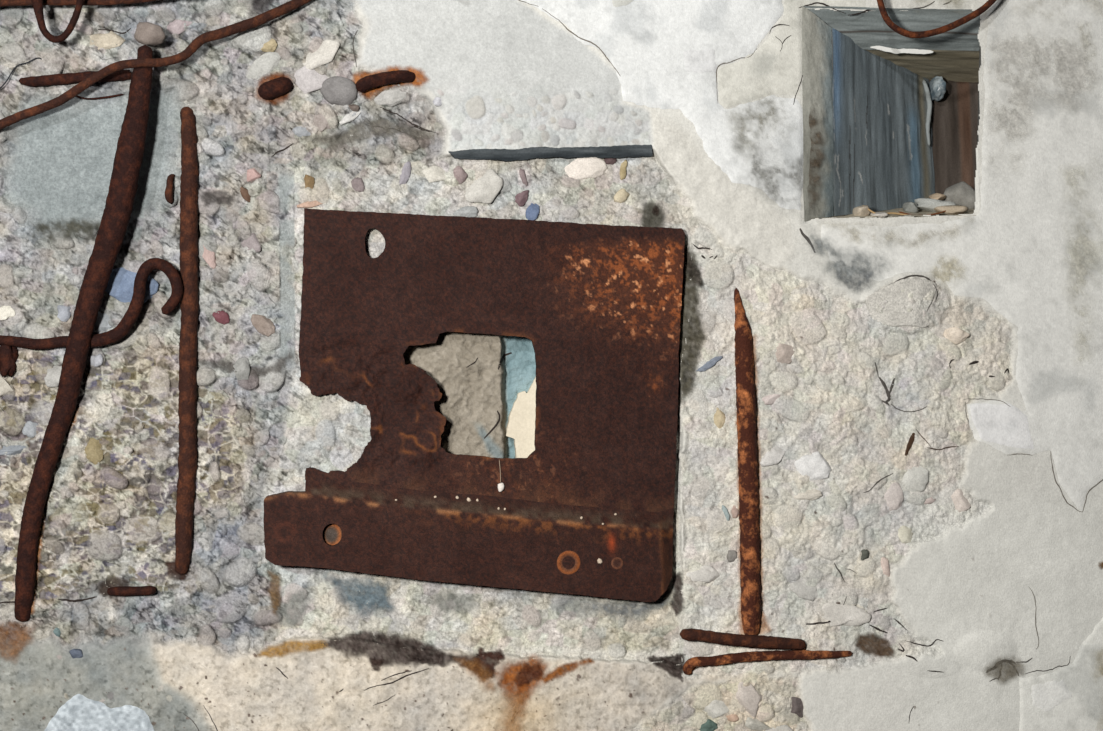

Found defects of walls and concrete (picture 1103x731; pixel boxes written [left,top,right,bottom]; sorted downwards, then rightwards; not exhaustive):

corrosion [354,67,427,97]
flaking render [521,0,866,210]
spalling [0,0,793,664]
spalling [630,0,1103,731]
crack [1011,451,1103,512]
damp [413,653,445,666]
corrosion [460,648,593,731]